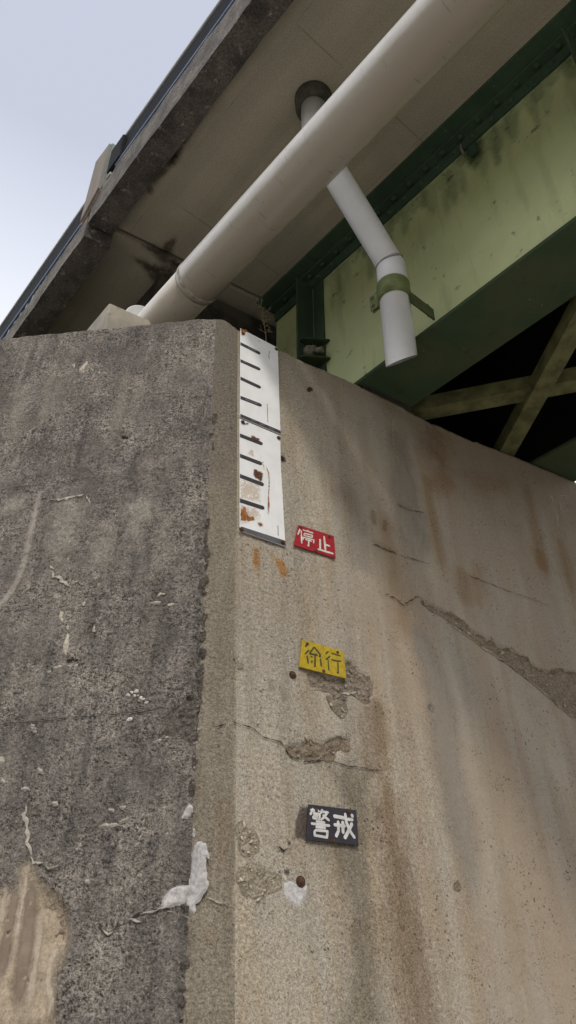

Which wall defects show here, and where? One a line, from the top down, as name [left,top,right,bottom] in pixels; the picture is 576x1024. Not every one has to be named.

spalling [307,660,372,718]
spalling [421,603,576,719]
crack [201,720,380,771]
spalling [286,735,350,762]